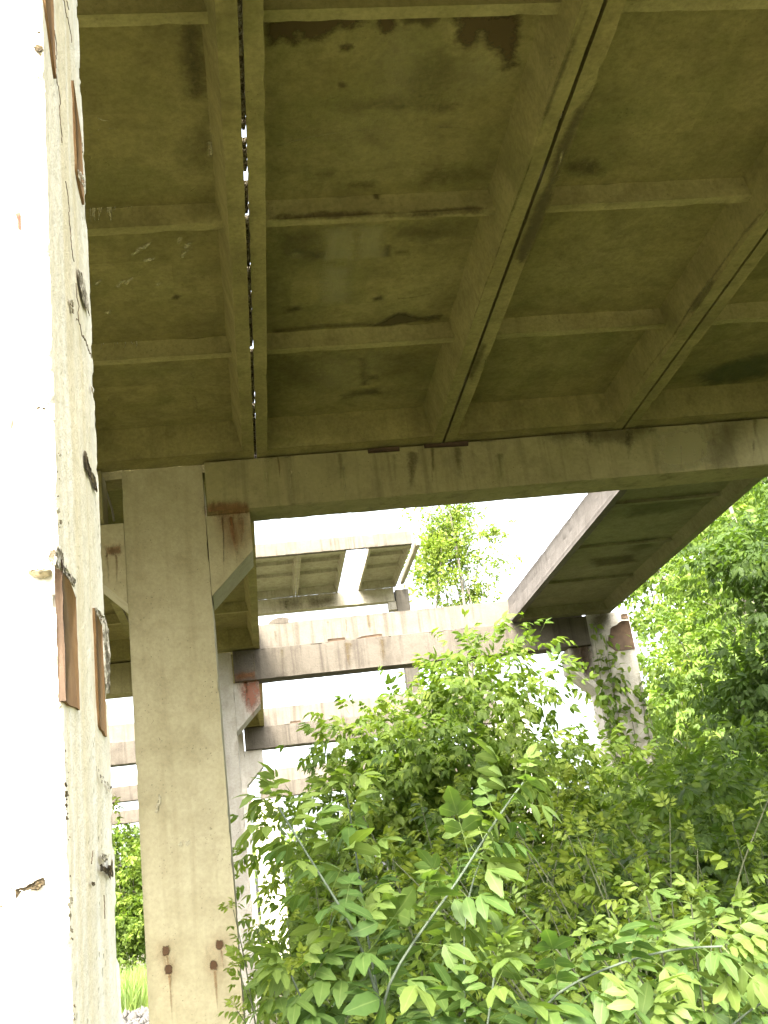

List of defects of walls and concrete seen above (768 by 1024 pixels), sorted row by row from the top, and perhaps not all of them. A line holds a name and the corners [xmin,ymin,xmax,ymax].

crack [65,181,92,358]
spalling [84,450,98,492]
rust [237,672,260,709]
spalling [0,877,52,907]
rust [162,946,172,995]
rust [210,940,223,995]